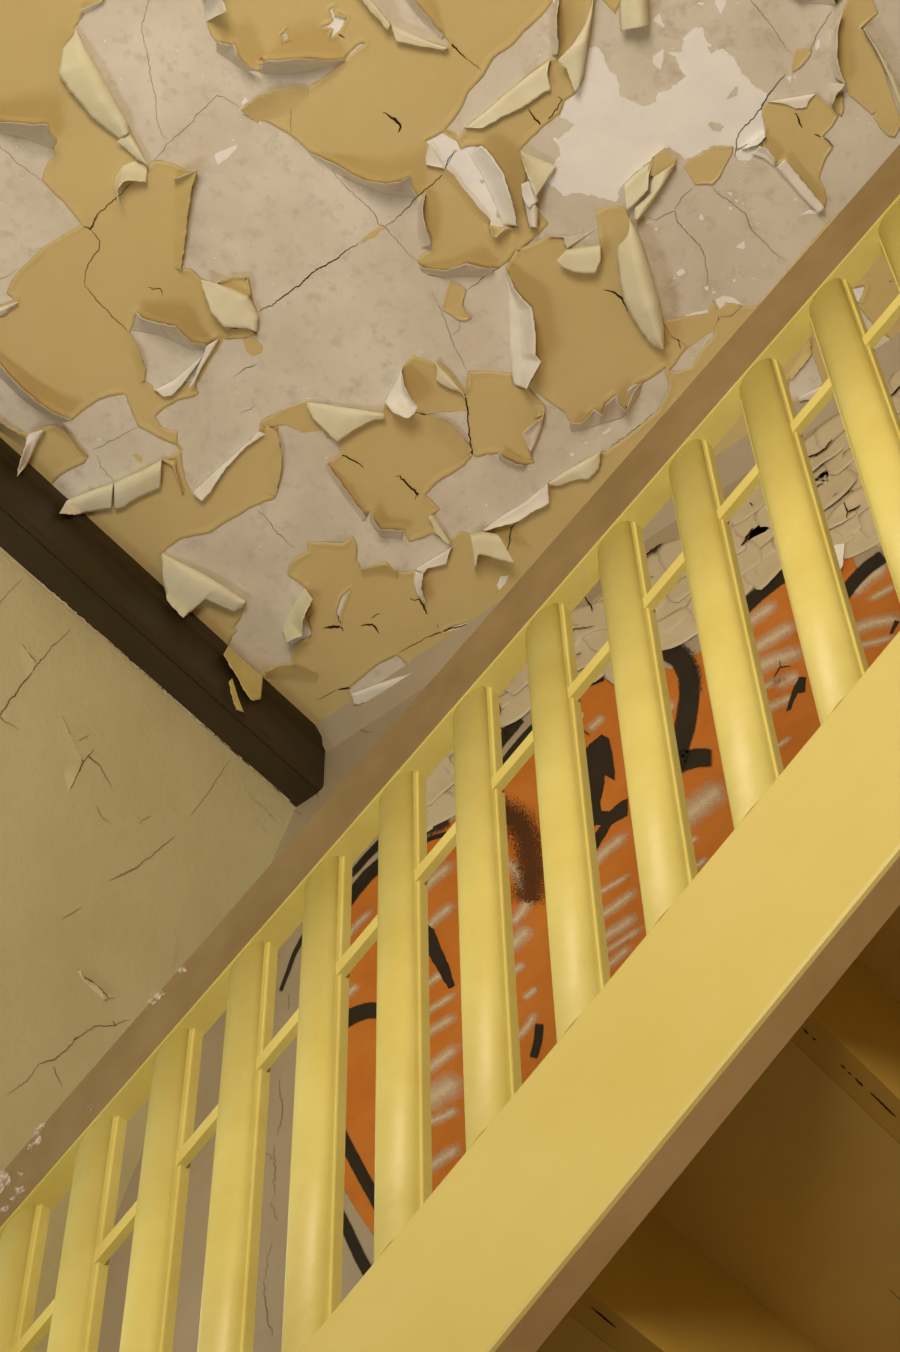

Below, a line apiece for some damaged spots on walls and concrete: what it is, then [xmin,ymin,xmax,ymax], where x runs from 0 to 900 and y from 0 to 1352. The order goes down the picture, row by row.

peeling [0,0,900,712]
crack [0,630,69,730]
spalling [0,549,290,801]
peeling [499,664,531,735]
crack [54,716,110,821]
crack [112,761,229,880]
peeling [426,749,455,832]
crack [8,1020,126,1094]
crack [591,1307,616,1328]